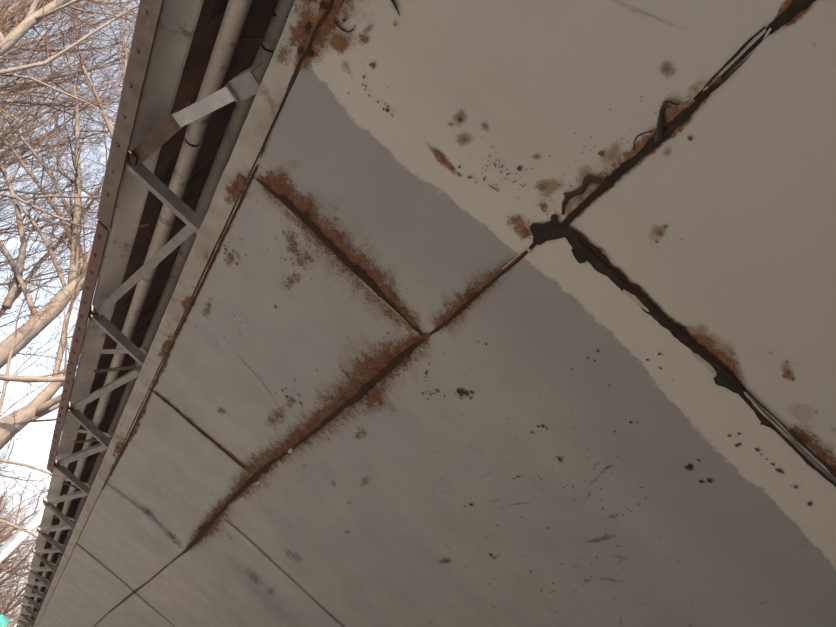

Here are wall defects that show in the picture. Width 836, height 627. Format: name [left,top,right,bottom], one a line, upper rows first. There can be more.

rust [774,0,816,26]
rust [431,146,558,217]
rust [566,77,721,218]
rust [103,0,536,553]
crack [553,0,836,487]
rust [687,329,740,378]
rust [789,426,836,471]